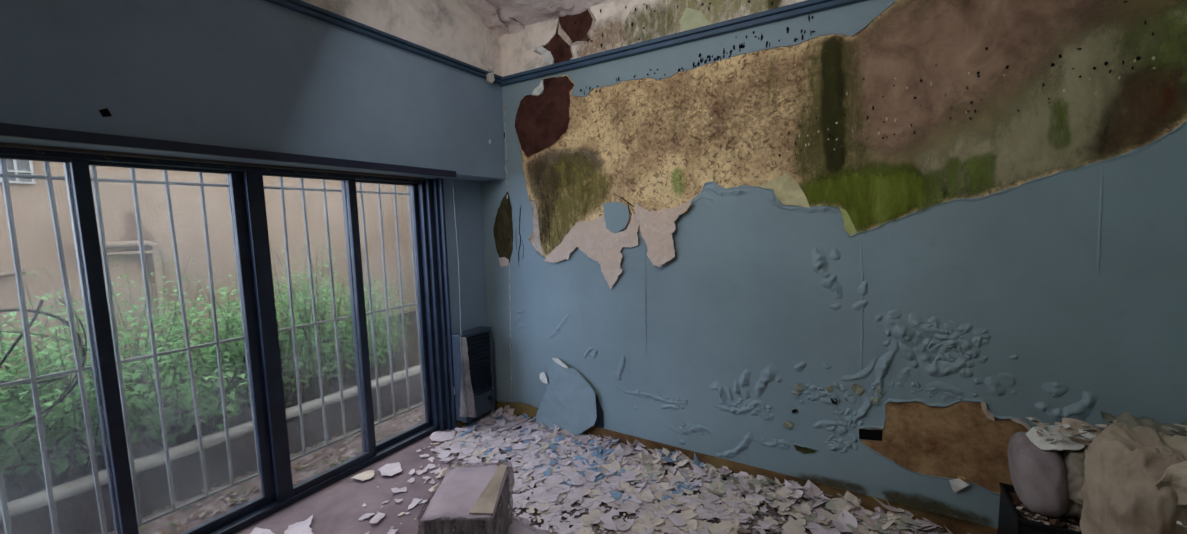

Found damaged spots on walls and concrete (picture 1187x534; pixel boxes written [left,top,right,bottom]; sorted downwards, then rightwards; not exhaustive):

flaking render [514,0,1187,289]
water stain [616,0,1187,233]
flaking render [493,192,513,267]
water stain [528,149,613,253]
flaking render [856,398,1032,496]